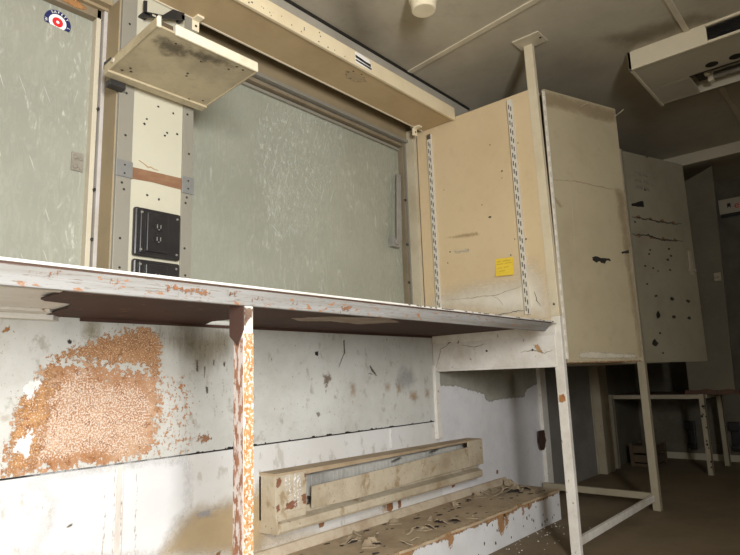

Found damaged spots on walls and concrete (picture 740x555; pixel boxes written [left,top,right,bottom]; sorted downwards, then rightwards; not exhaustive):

peeling [440,368,537,402]